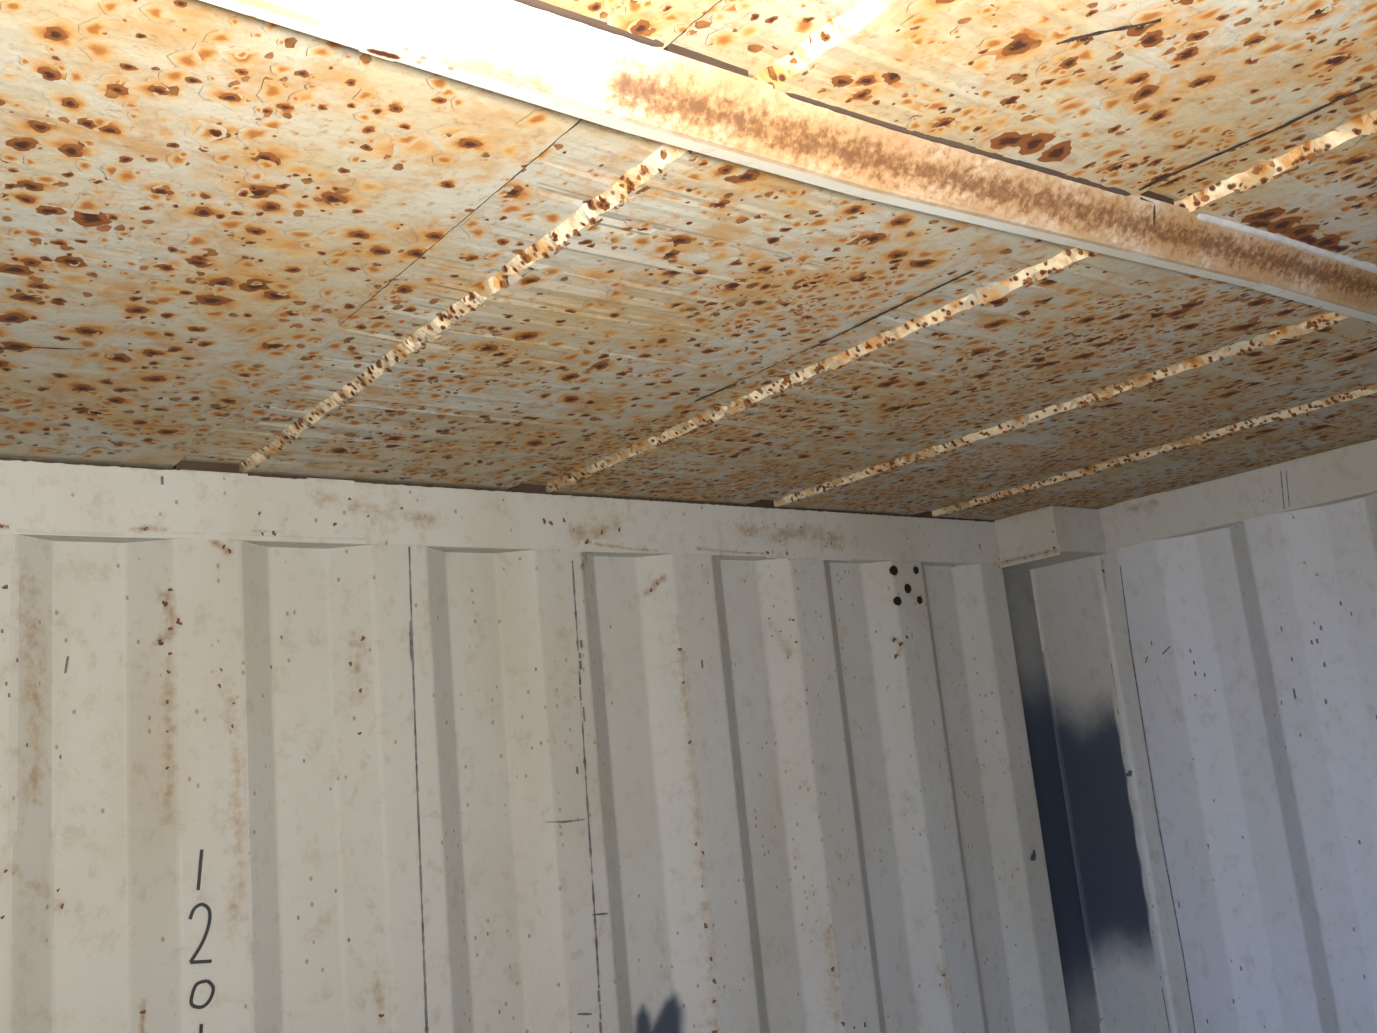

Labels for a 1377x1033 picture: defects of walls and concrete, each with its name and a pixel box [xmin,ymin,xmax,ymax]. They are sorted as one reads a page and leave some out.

corrosion [0,0,1377,601]